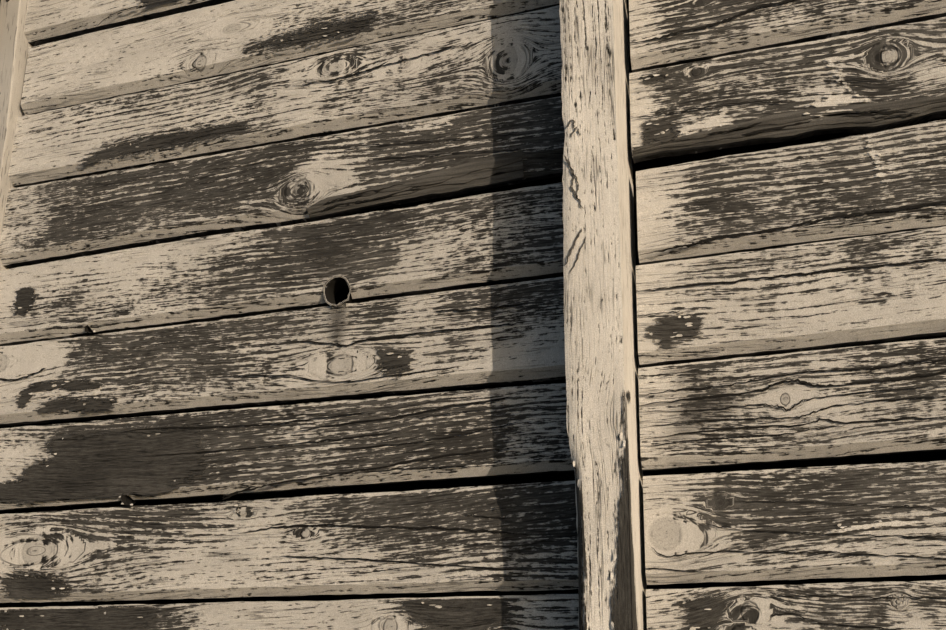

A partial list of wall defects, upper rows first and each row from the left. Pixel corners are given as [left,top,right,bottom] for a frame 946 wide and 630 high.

peeling [77,117,251,166]
peeling [399,116,457,137]
spalling [632,58,946,187]
spalling [307,152,525,219]
peeling [13,286,40,319]
peeling [644,311,704,350]
peeling [15,378,118,413]
peeling [0,424,209,506]
peeling [573,461,587,630]
peeling [610,390,638,630]
peeling [831,515,919,535]
peeling [0,567,159,630]